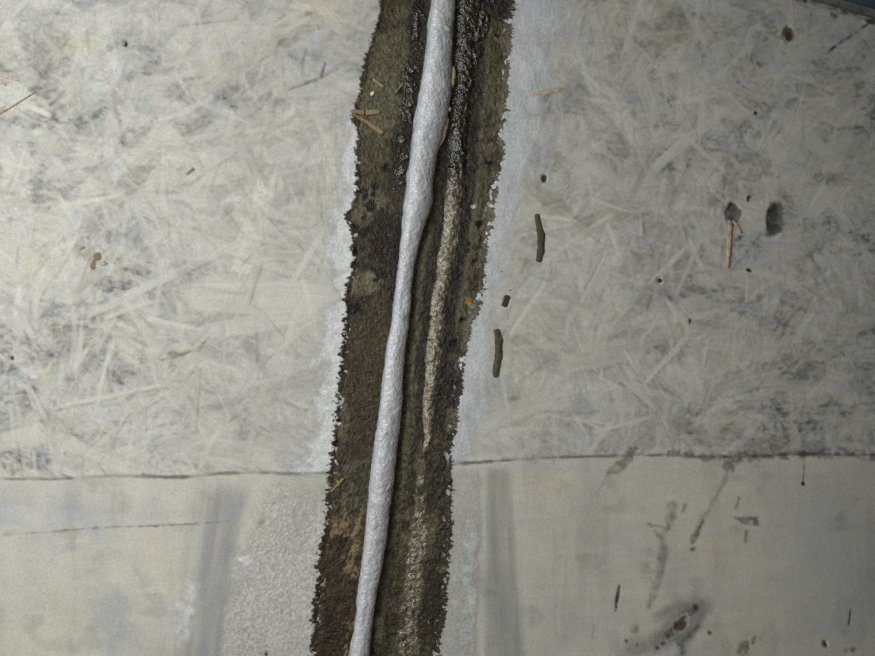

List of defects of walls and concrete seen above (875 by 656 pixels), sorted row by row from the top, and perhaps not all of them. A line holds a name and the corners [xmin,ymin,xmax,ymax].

damp [309,0,431,656]
damp [370,0,518,656]
corrosion [656,606,697,649]